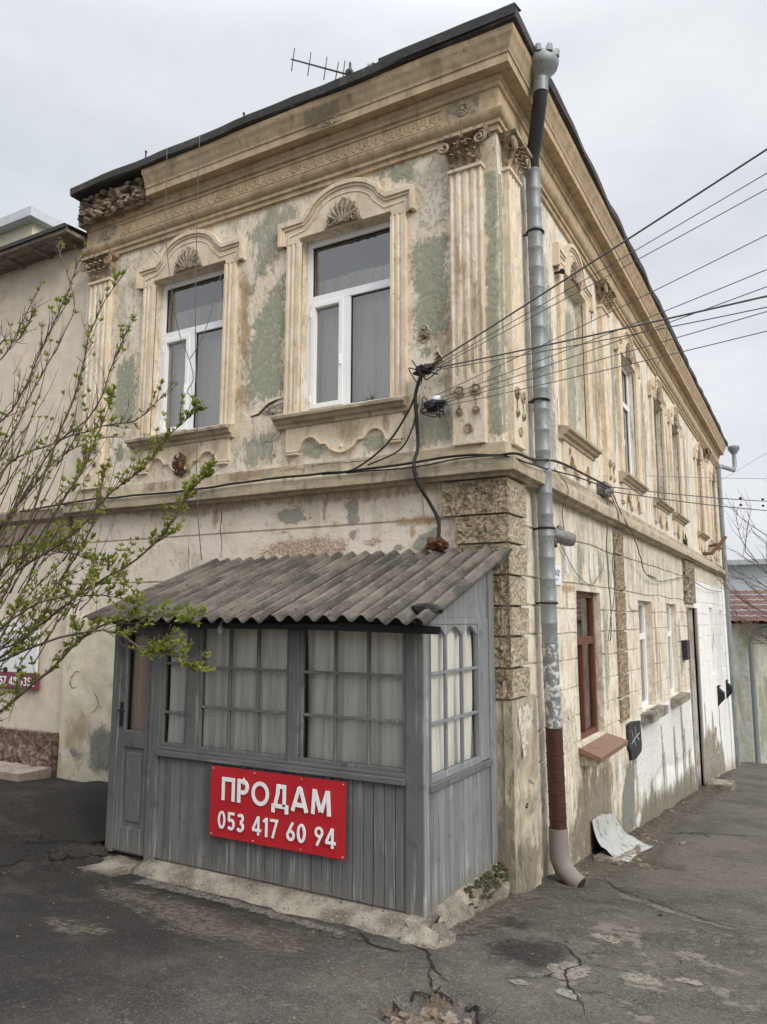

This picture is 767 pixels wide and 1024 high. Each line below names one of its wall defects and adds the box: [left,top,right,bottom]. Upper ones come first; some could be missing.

peeling [246,199,305,296]
peeling [373,155,451,367]
peeling [244,271,286,416]
peeling [228,432,276,480]
flaking render [258,530,380,557]
damp [572,705,726,860]